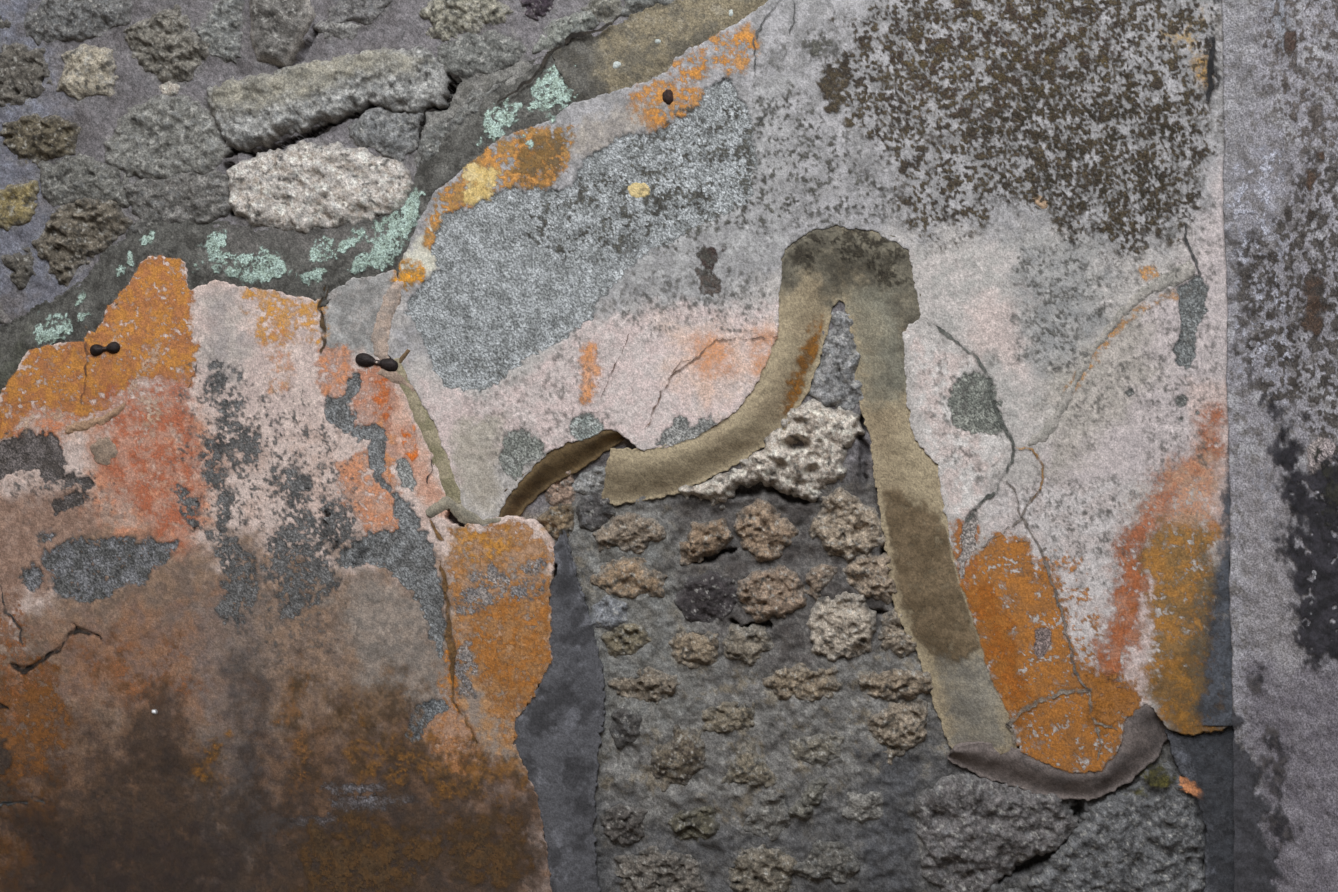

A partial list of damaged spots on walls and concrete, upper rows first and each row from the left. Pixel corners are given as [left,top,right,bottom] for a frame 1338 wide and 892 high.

spalling [404,78,758,392]
peeling [129,343,161,430]
spalling [569,413,604,441]
spalling [655,413,723,446]
crack [927,321,1117,760]
crack [0,585,102,674]